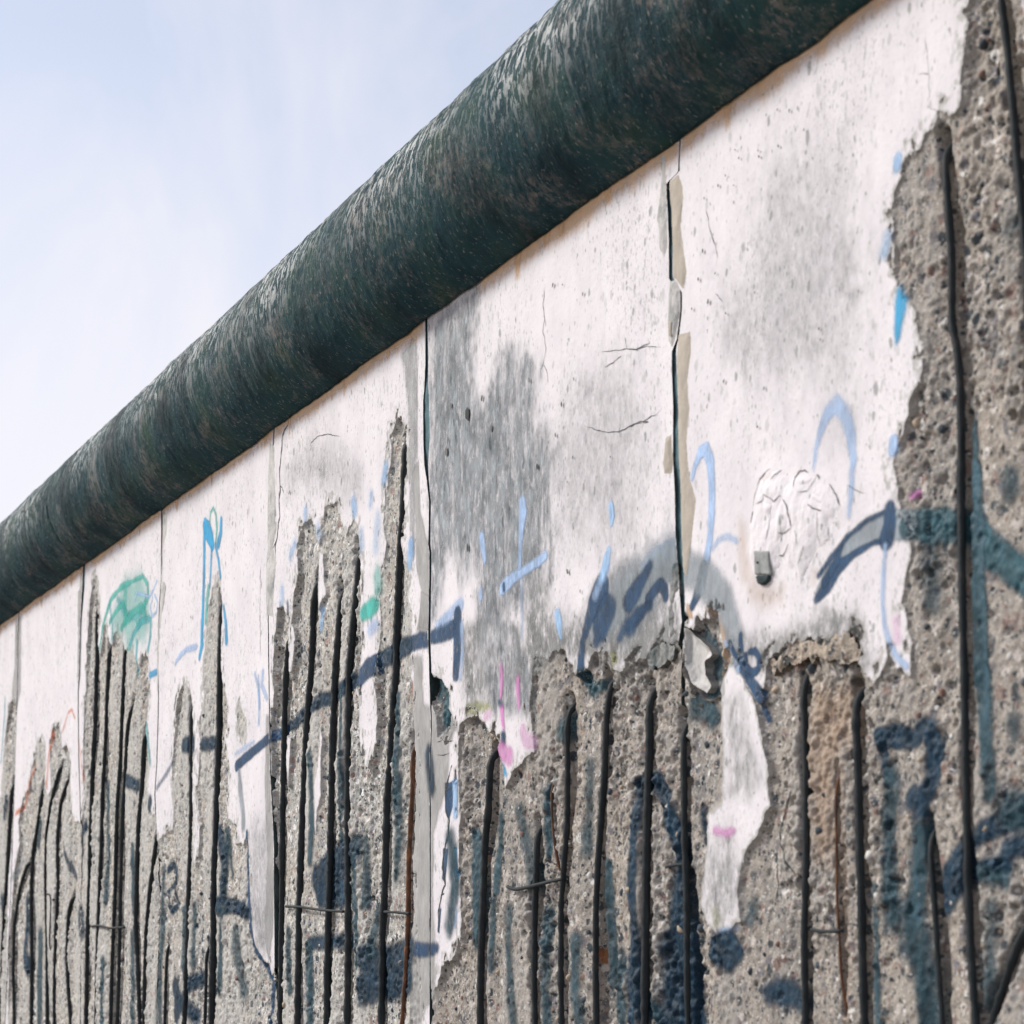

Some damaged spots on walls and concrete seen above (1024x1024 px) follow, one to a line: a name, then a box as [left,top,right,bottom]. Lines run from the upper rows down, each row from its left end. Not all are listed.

crack [589,414,657,434]
crack [602,339,656,367]
spalling [885,0,1024,555]
spalling [0,409,1024,1024]